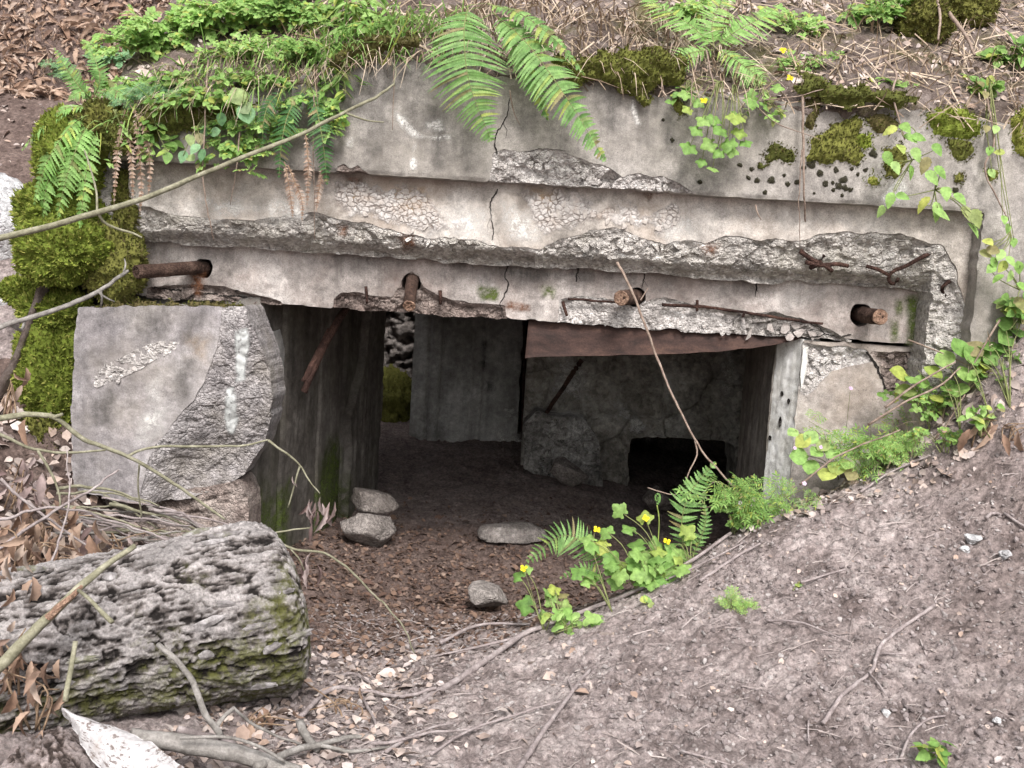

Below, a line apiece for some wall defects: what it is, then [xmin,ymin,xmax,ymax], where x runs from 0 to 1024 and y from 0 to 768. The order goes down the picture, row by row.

spalling [489,148,692,195]
leakage [505,208,536,239]
corrosion [798,248,849,273]
corrosion [866,253,931,285]
spalling [134,205,965,399]
corrosion [662,300,823,325]
spalling [140,284,286,505]